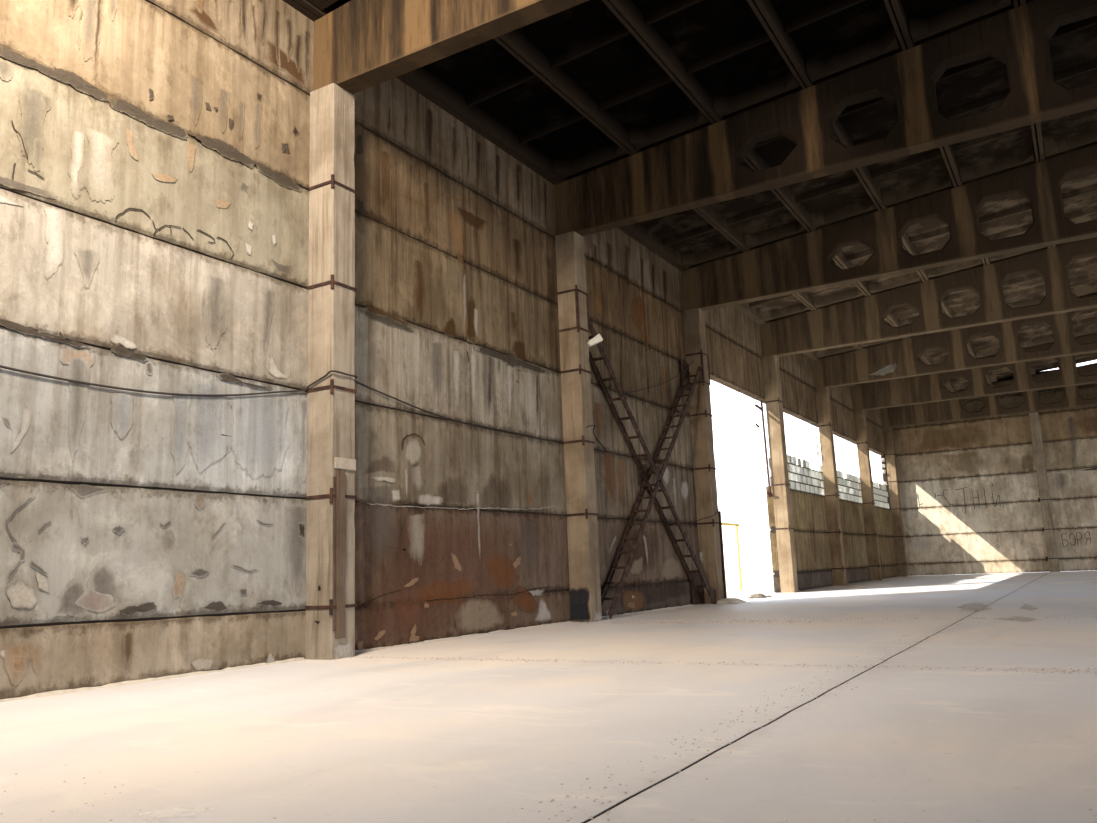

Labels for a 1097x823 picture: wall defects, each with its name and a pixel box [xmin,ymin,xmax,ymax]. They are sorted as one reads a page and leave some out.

crack [11,120,45,180]
crack [115,208,234,260]
water stain [110,333,137,349]
water stain [60,348,95,461]
water stain [111,393,134,439]
water stain [170,383,308,483]
crack [0,496,52,581]
rust [356,516,538,649]